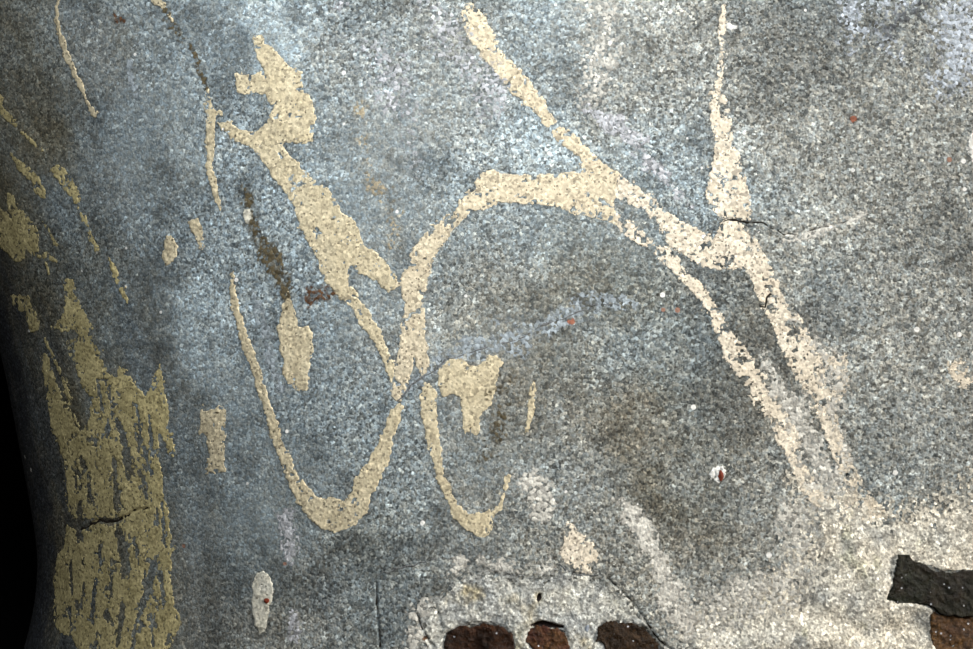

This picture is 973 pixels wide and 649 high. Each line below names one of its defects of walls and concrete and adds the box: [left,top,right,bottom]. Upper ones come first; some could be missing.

crack [721,219,848,235]
crack [80,507,148,530]
crack [373,559,437,648]